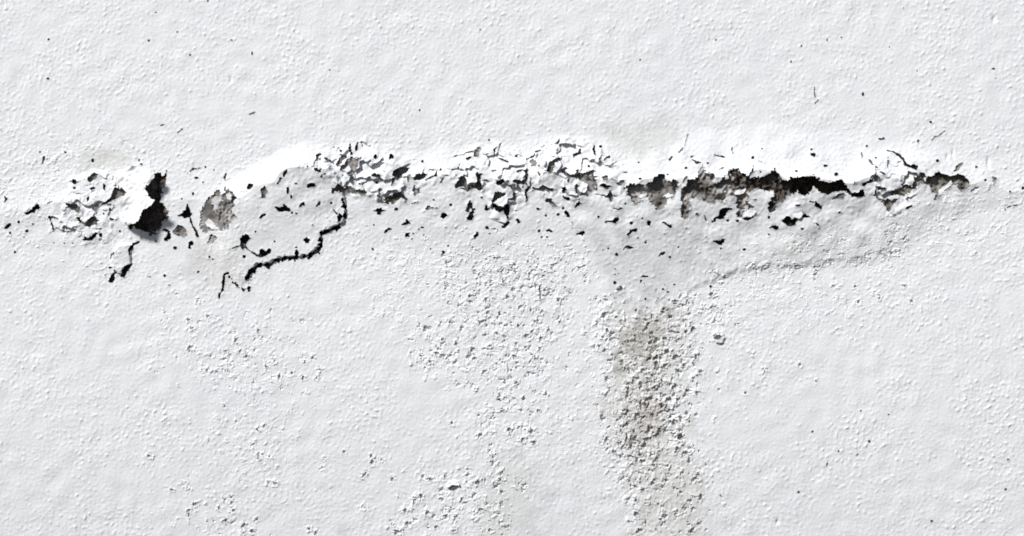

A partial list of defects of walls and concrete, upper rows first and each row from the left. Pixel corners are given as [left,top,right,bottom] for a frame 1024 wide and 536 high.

peeling [45,164,188,286]
crack [218,223,343,299]
peeling [199,135,753,304]
peeling [868,144,969,218]